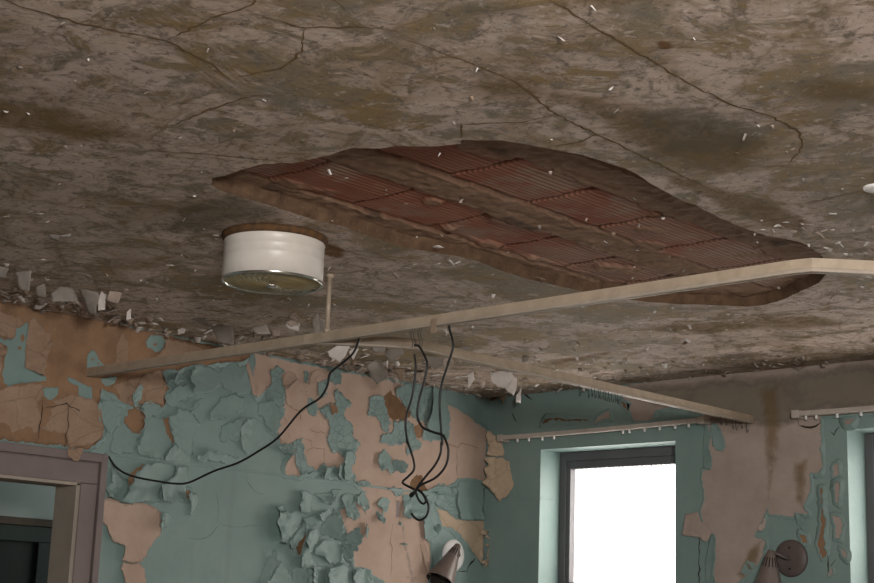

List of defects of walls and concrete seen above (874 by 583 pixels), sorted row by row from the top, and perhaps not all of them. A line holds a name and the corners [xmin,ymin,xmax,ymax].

crack [6,0,722,195]
crack [550,0,803,179]
rust [325,244,343,258]
spalling [211,176,636,292]
peeling [754,218,870,258]
peeling [0,263,589,583]
peeling [501,274,874,429]
peeling [682,405,874,583]